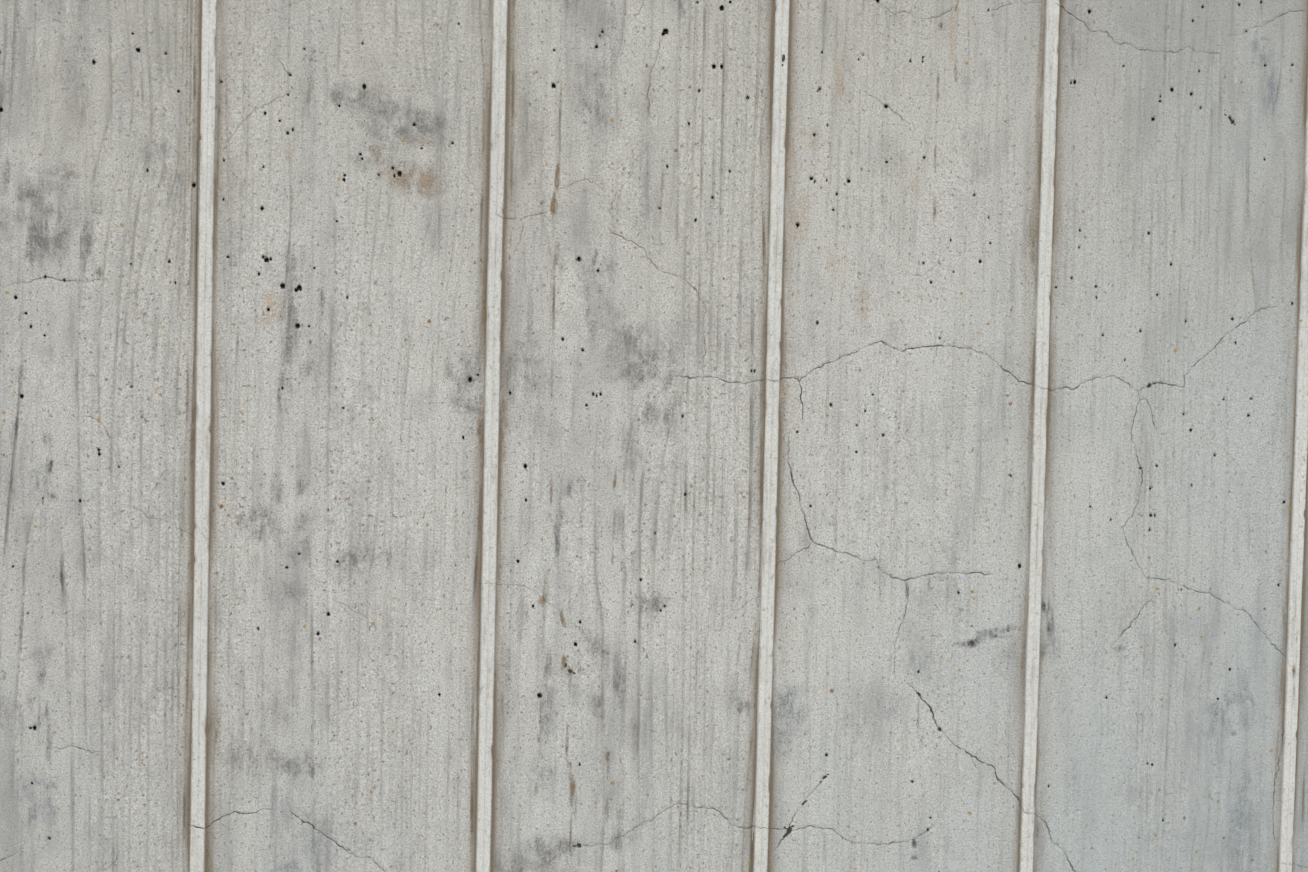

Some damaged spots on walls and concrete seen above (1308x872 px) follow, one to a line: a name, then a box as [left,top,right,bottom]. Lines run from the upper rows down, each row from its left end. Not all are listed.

crack [789,341,959,433]
crack [787,465,850,560]
crack [957,746,1020,806]
crack [192,809,352,854]